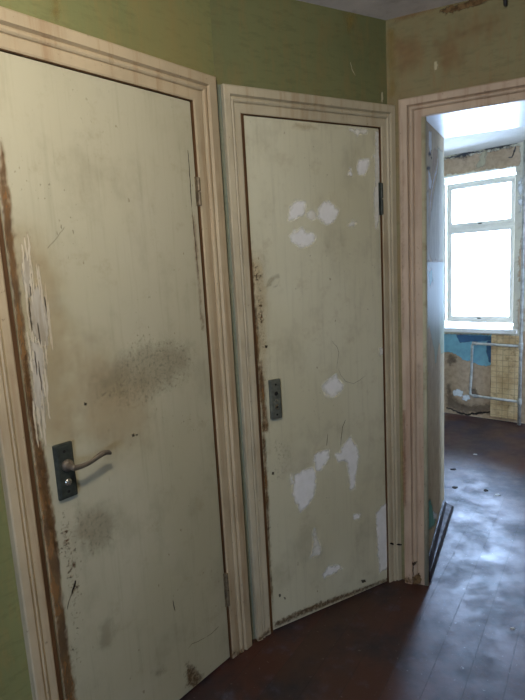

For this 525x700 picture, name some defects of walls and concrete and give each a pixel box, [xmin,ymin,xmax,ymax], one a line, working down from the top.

spalling [440,0,487,14]
peeling [291,229,314,246]
peeling [289,202,338,224]
peeling [349,132,379,223]
flaking render [427,131,525,423]
peeling [21,233,53,447]
peeling [294,438,358,510]
peeling [376,504,387,572]